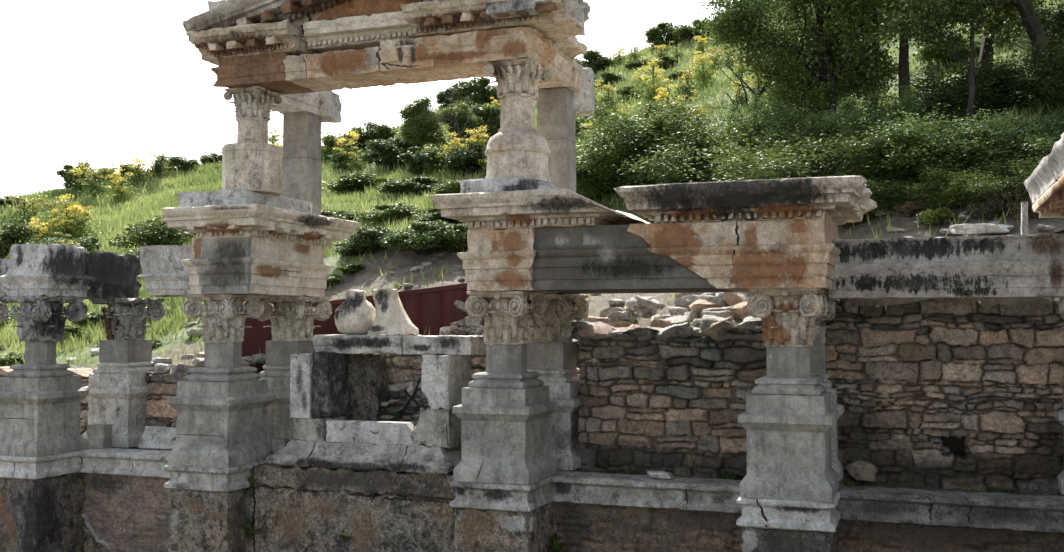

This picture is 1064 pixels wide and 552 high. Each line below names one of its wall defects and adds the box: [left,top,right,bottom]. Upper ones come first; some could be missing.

leakage [622,177,834,217]
leakage [43,245,132,294]
crack [729,221,740,288]
leakage [835,236,1020,298]
crack [756,499,768,527]